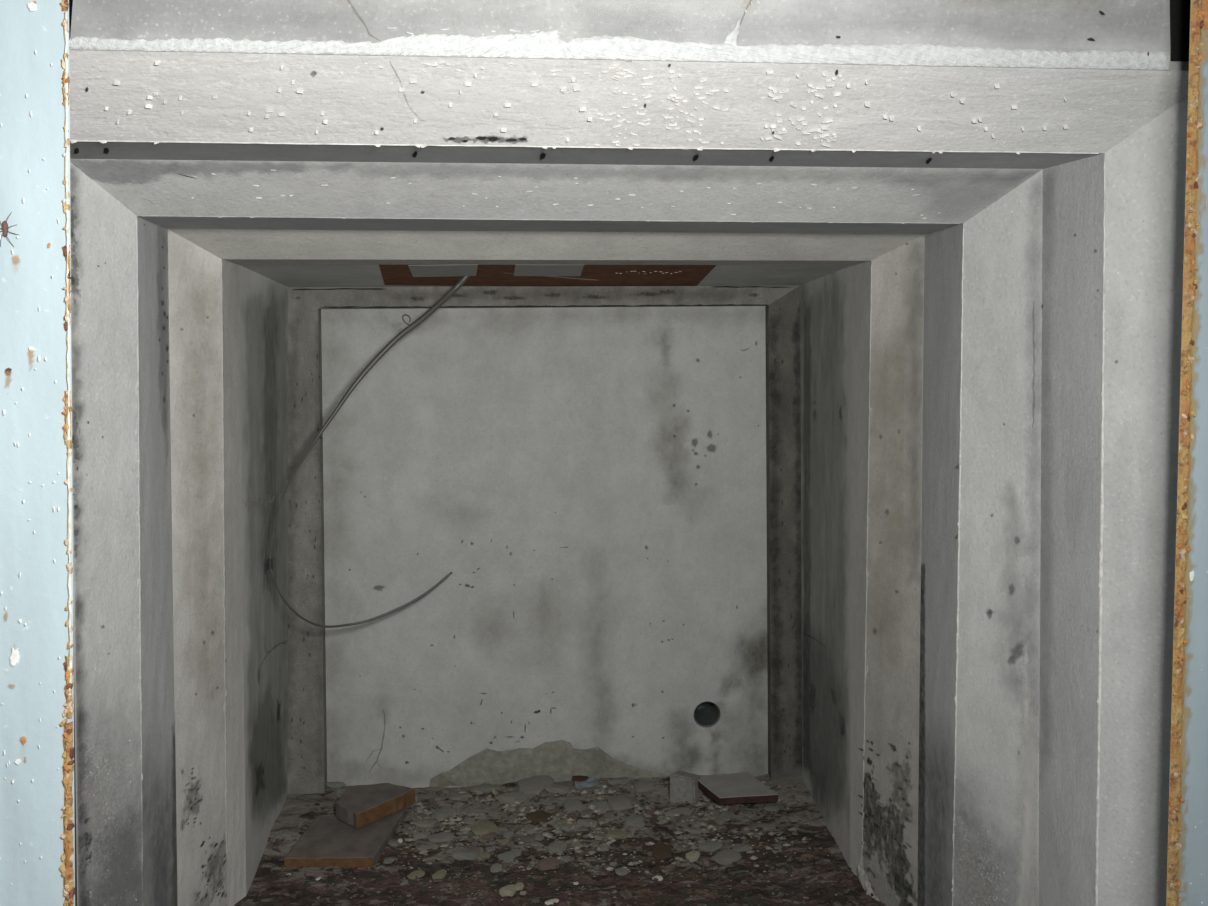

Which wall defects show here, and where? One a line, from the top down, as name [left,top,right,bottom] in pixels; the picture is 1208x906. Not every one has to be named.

crack [724,1,752,47]
rust [62,71,70,106]
rust [48,243,71,331]
rust [62,390,72,439]
rust [1166,0,1208,906]
rust [10,648,20,666]
rust [60,656,75,906]
damp [78,711,201,906]
damp [859,569,1038,906]